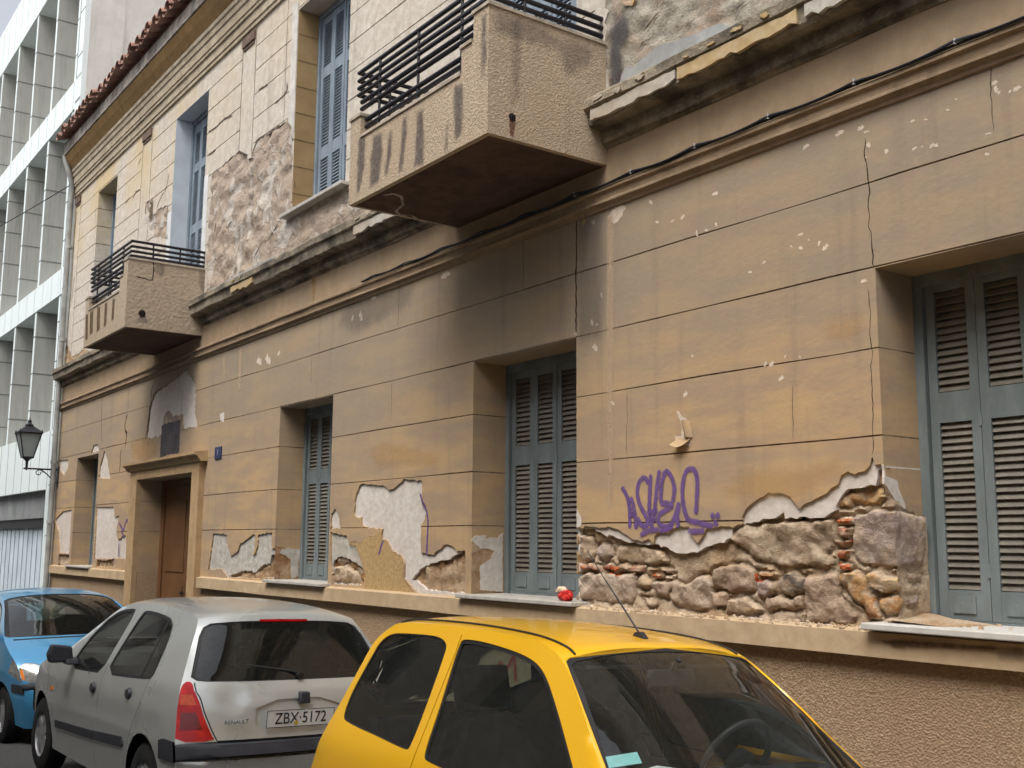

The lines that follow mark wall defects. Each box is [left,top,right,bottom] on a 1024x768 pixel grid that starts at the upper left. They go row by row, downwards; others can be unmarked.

leakage [357,114,423,191]
crack [864,138,874,266]
peeling [148,370,198,438]
crack [867,291,875,453]
peeling [92,445,110,479]
peeling [56,510,72,565]
peeling [95,507,126,567]
peeling [209,533,300,579]
peeling [332,479,503,596]
spalling [576,460,1013,632]